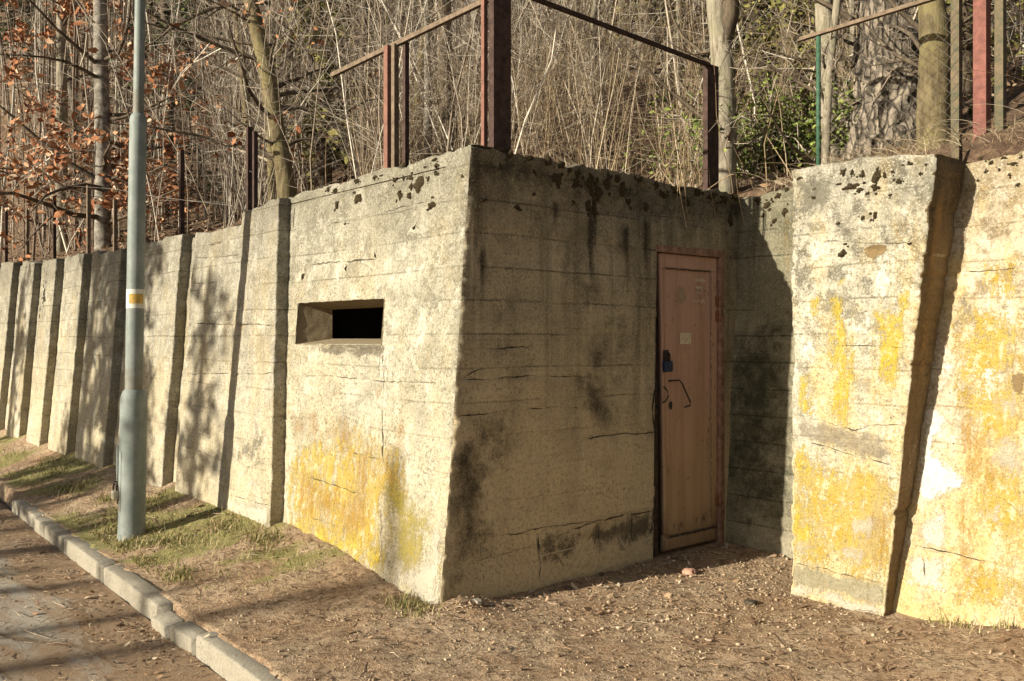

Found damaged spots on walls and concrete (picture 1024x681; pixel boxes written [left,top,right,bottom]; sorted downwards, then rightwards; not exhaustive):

spalling [865,244,887,260]
damp [450,448,483,553]
crack [477,432,657,577]